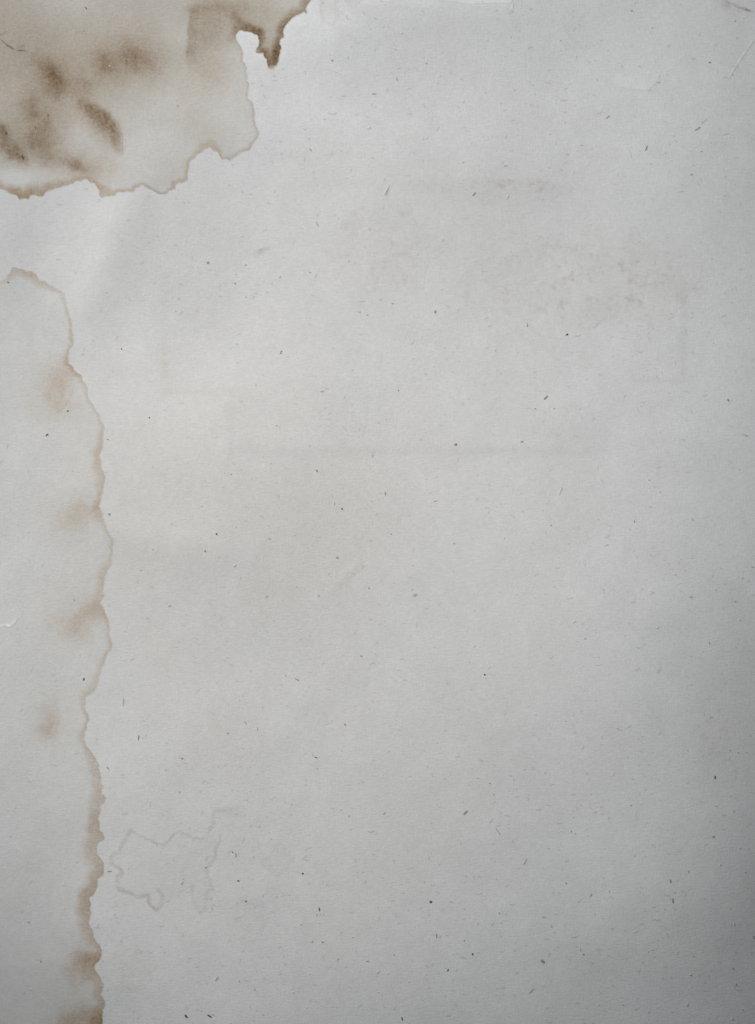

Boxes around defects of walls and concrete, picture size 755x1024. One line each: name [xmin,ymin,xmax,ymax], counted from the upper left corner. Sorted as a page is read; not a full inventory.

leakage [0,0,361,200]
leakage [0,267,248,1024]